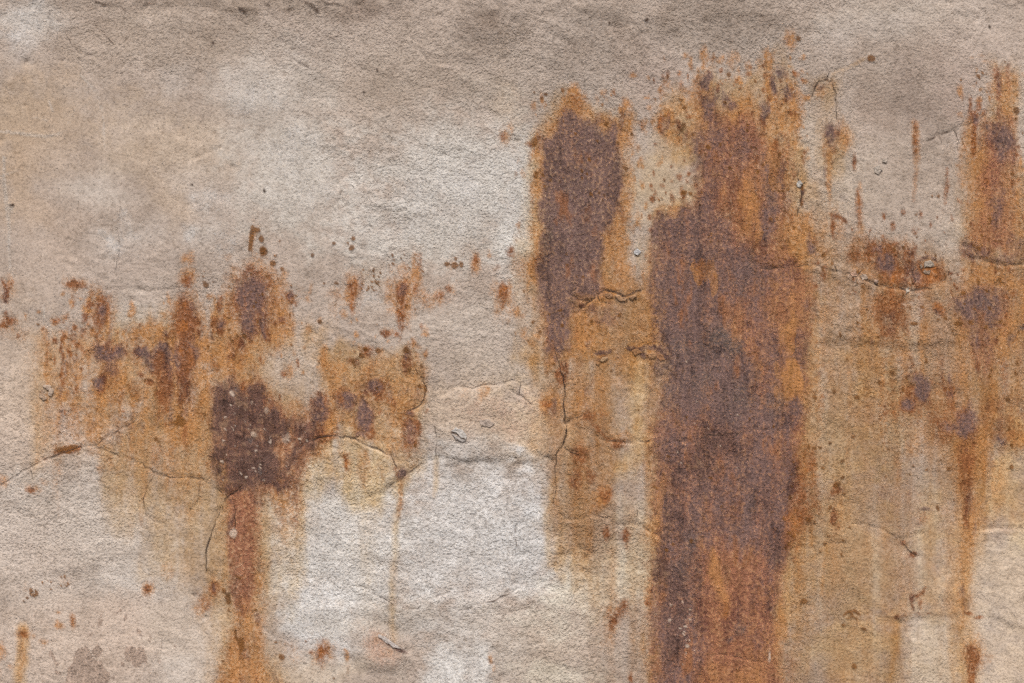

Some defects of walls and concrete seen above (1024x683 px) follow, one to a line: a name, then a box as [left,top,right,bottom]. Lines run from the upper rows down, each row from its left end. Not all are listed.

crack [1,420,242,575]
corrosion [44,225,427,683]
crack [298,433,470,497]
corrosion [515,87,643,448]
crack [513,352,663,539]
corrosion [640,51,851,683]
corrosion [890,368,930,413]
corrosion [831,61,1024,377]
corrosion [933,378,1024,619]
corrosion [965,644,980,683]